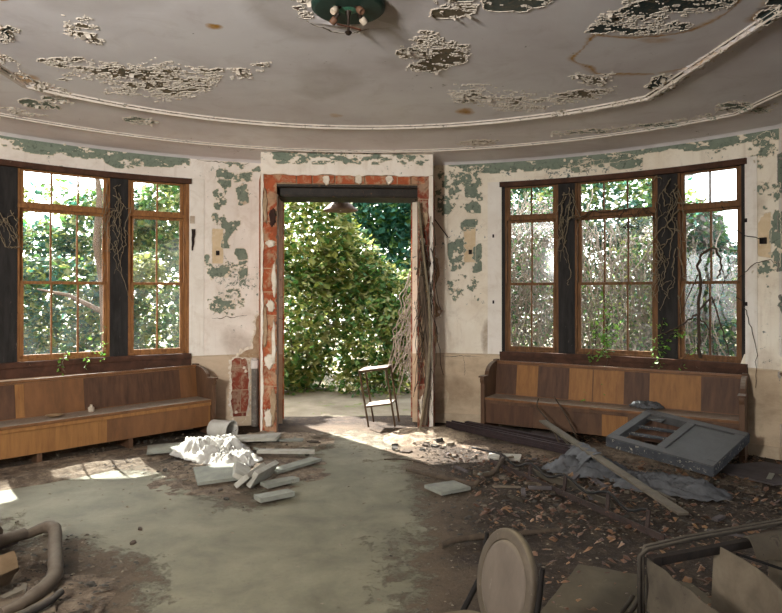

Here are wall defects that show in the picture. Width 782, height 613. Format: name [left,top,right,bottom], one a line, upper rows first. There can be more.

peeling [61,14,105,46]
peeling [395,30,472,75]
peeling [428,0,554,21]
peeling [583,0,738,36]
water stain [565,0,772,77]
peeling [748,0,782,35]
peeling [0,54,272,117]
peeling [447,60,715,118]
peeling [0,135,190,169]
peeling [204,161,261,316]
peeling [271,128,782,352]
spalling [228,313,259,423]